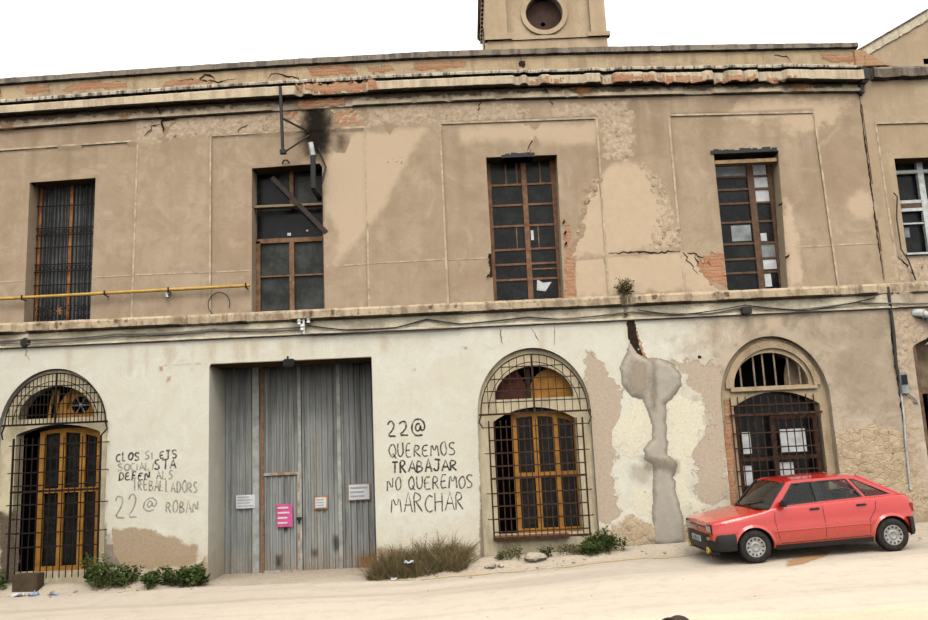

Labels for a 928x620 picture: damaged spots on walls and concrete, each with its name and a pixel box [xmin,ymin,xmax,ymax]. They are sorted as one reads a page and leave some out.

flaking render [127,64,531,152]
water stain [0,82,842,183]
flaking render [411,60,466,71]
flaking render [546,97,688,298]
flaking render [696,248,728,291]
peeling [574,342,656,547]
water stain [622,457,654,490]
peeling [663,347,738,542]
flaking render [834,307,928,523]